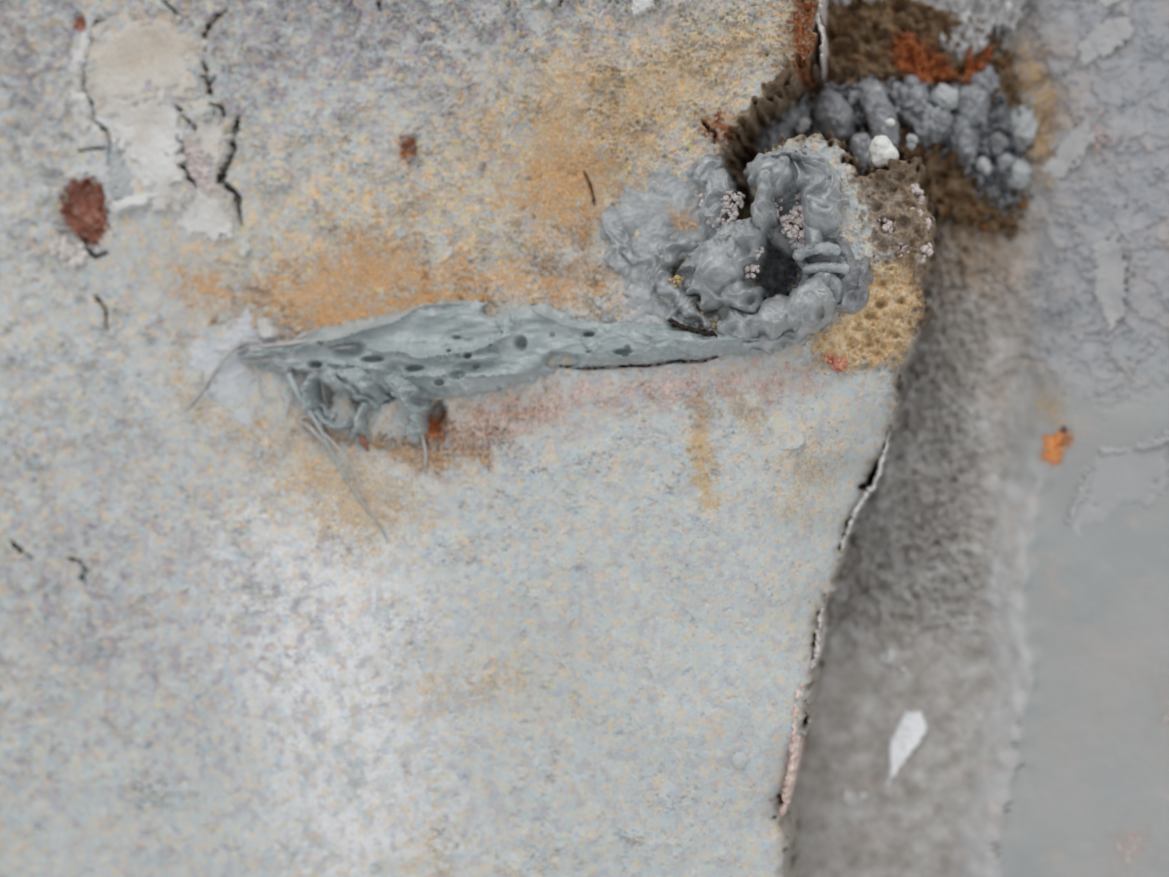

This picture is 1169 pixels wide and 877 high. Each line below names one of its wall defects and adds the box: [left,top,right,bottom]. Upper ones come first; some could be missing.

corrosion [887,28,993,87]
peeling [64,13,253,259]
corrosion [59,176,110,249]
corrosion [161,0,924,579]
corrosion [1042,428,1073,465]